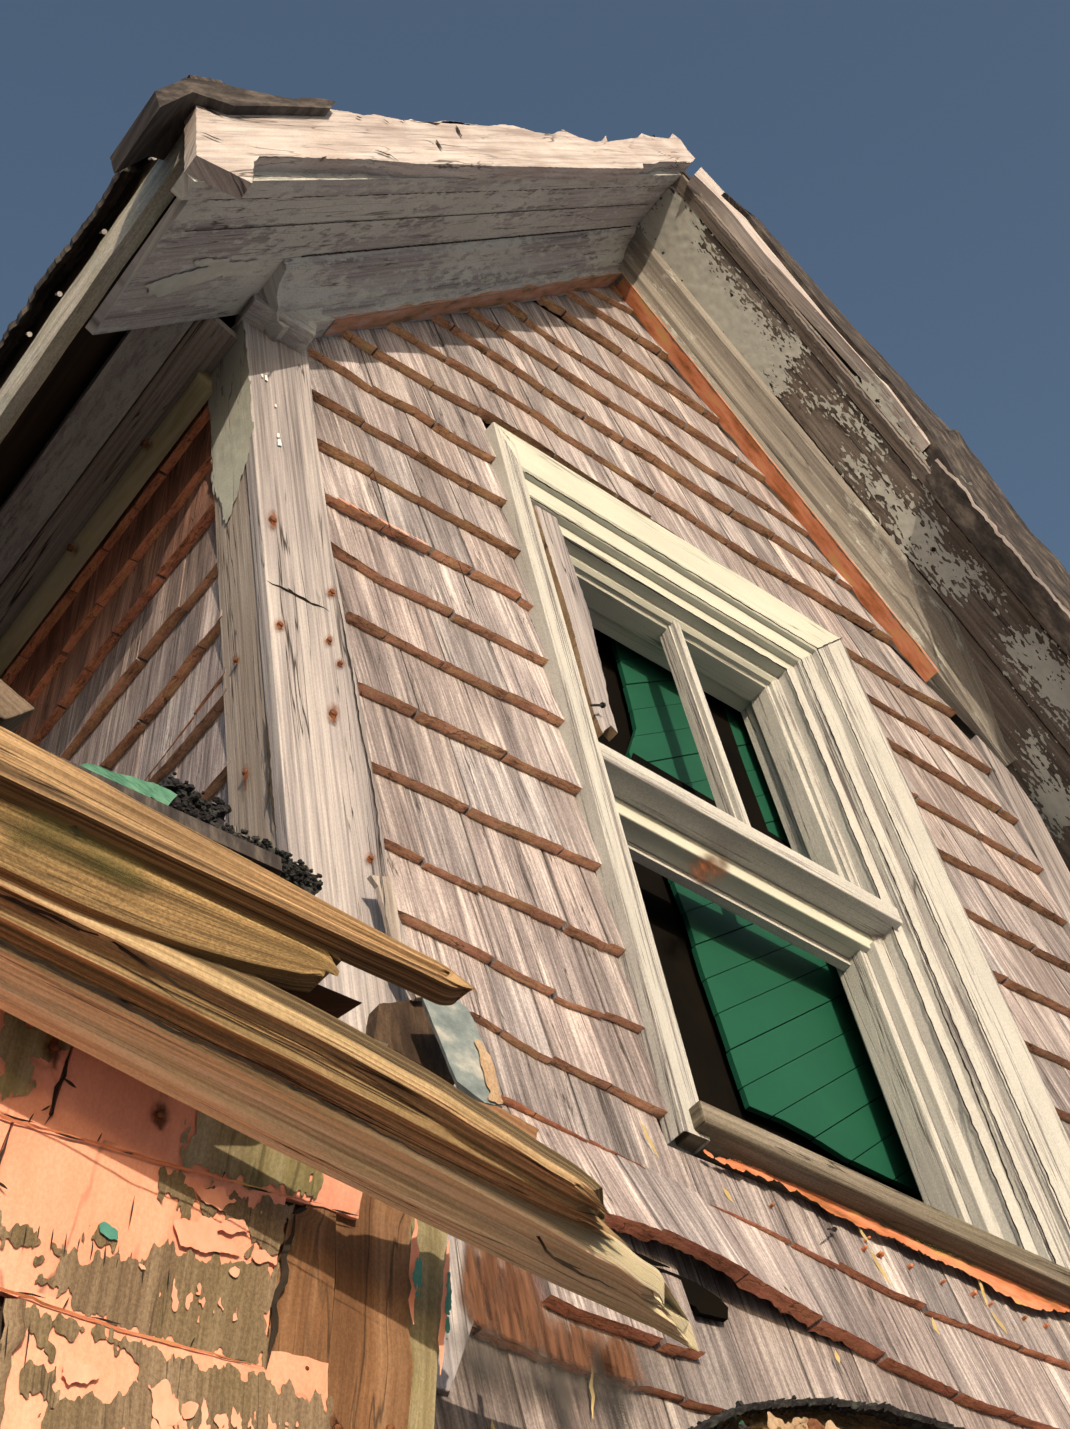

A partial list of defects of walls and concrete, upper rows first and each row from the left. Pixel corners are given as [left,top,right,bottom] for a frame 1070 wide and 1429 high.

peeling [208,324,268,524]
peeling [637,185,1070,843]
crack [68,826,87,840]
crack [265,713,276,831]
crack [268,579,384,874]
peeling [0,1012,71,1101]
crack [0,894,456,1173]
peeling [0,1110,334,1429]
crack [0,1050,359,1427]
crack [536,1236,615,1289]
peeling [703,1149,1070,1313]